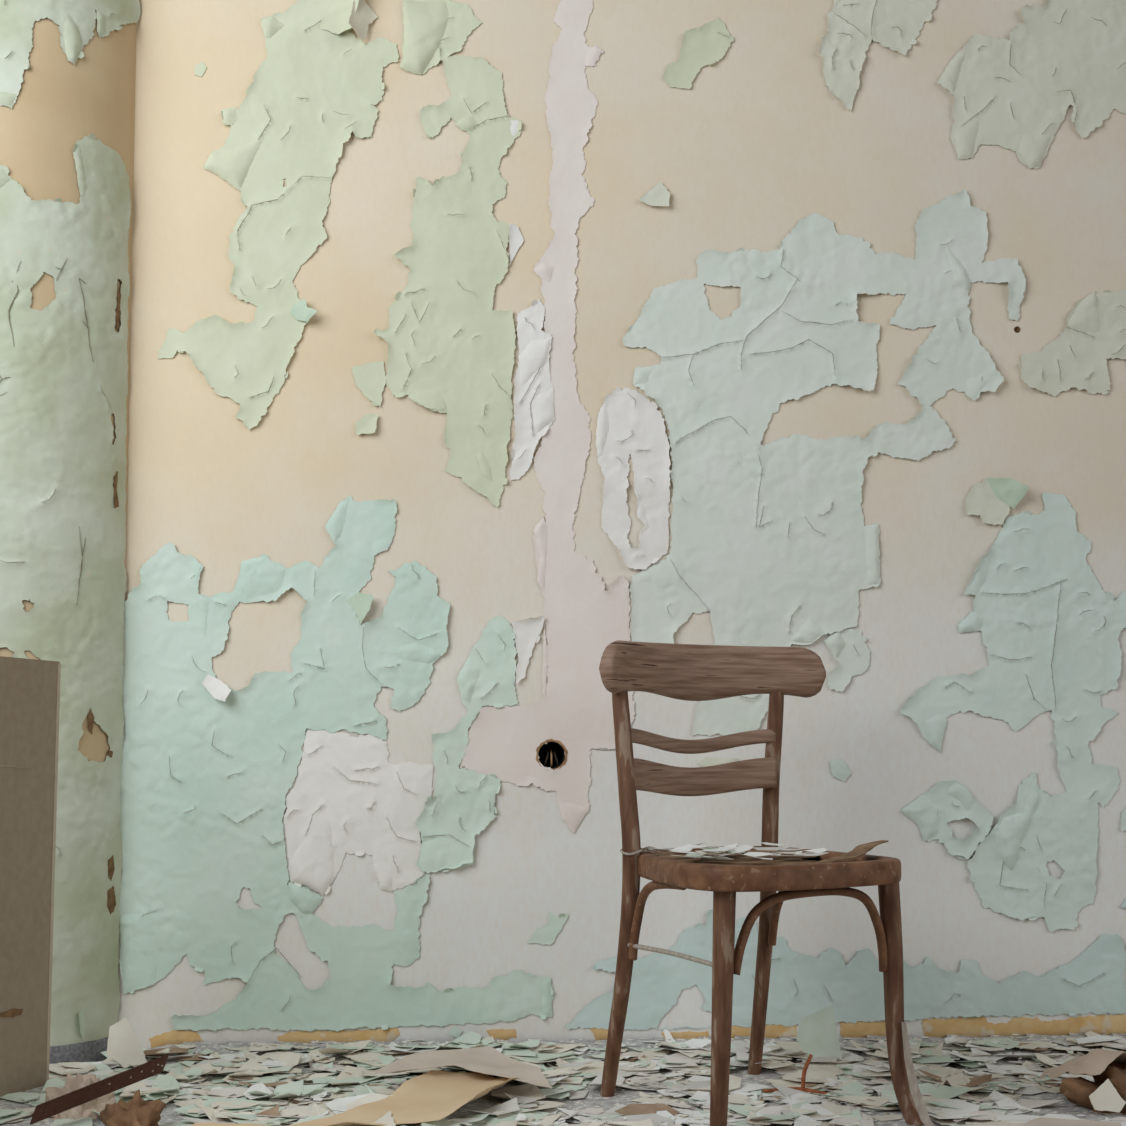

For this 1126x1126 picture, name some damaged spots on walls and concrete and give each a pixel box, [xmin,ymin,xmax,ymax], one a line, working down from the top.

peeling [0,0,141,109]
peeling [819,0,937,111]
peeling [937,0,1126,169]
peeling [158,0,555,507]
peeling [595,189,1026,692]
peeling [0,134,554,1068]
peeling [691,694,769,736]
peeling [900,477,1126,932]
peeling [624,910,713,1042]
peeling [732,917,758,1028]
peeling [766,936,885,1064]
peeling [903,934,1126,1021]